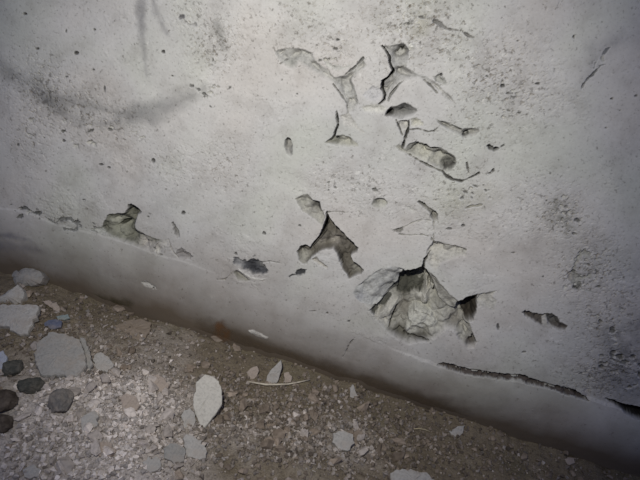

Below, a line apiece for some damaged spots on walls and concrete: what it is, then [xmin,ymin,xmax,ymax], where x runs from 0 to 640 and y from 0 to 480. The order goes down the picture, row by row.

spalling [274,7,496,201]
spalling [90,203,194,261]
flaking render [216,252,269,283]
spalling [287,193,498,350]
spalling [521,310,568,332]
crack [437,362,640,421]